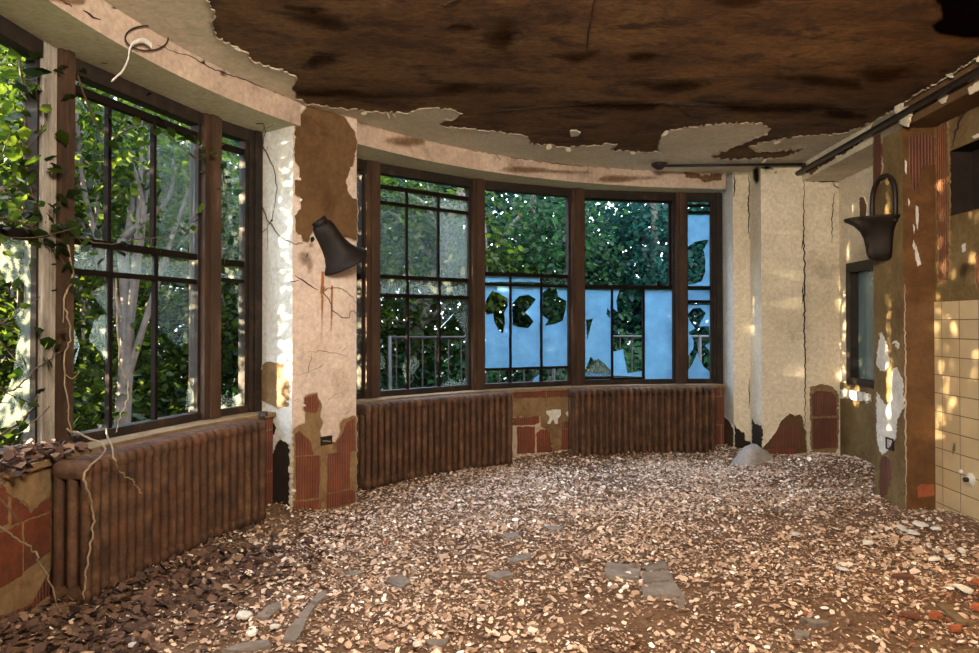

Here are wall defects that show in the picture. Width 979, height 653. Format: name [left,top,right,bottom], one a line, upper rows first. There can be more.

peeling [206,0,979,291]
flaking render [261,361,358,510]
flaking render [512,409,568,458]
flaking render [724,332,905,498]
flaking render [0,480,53,616]